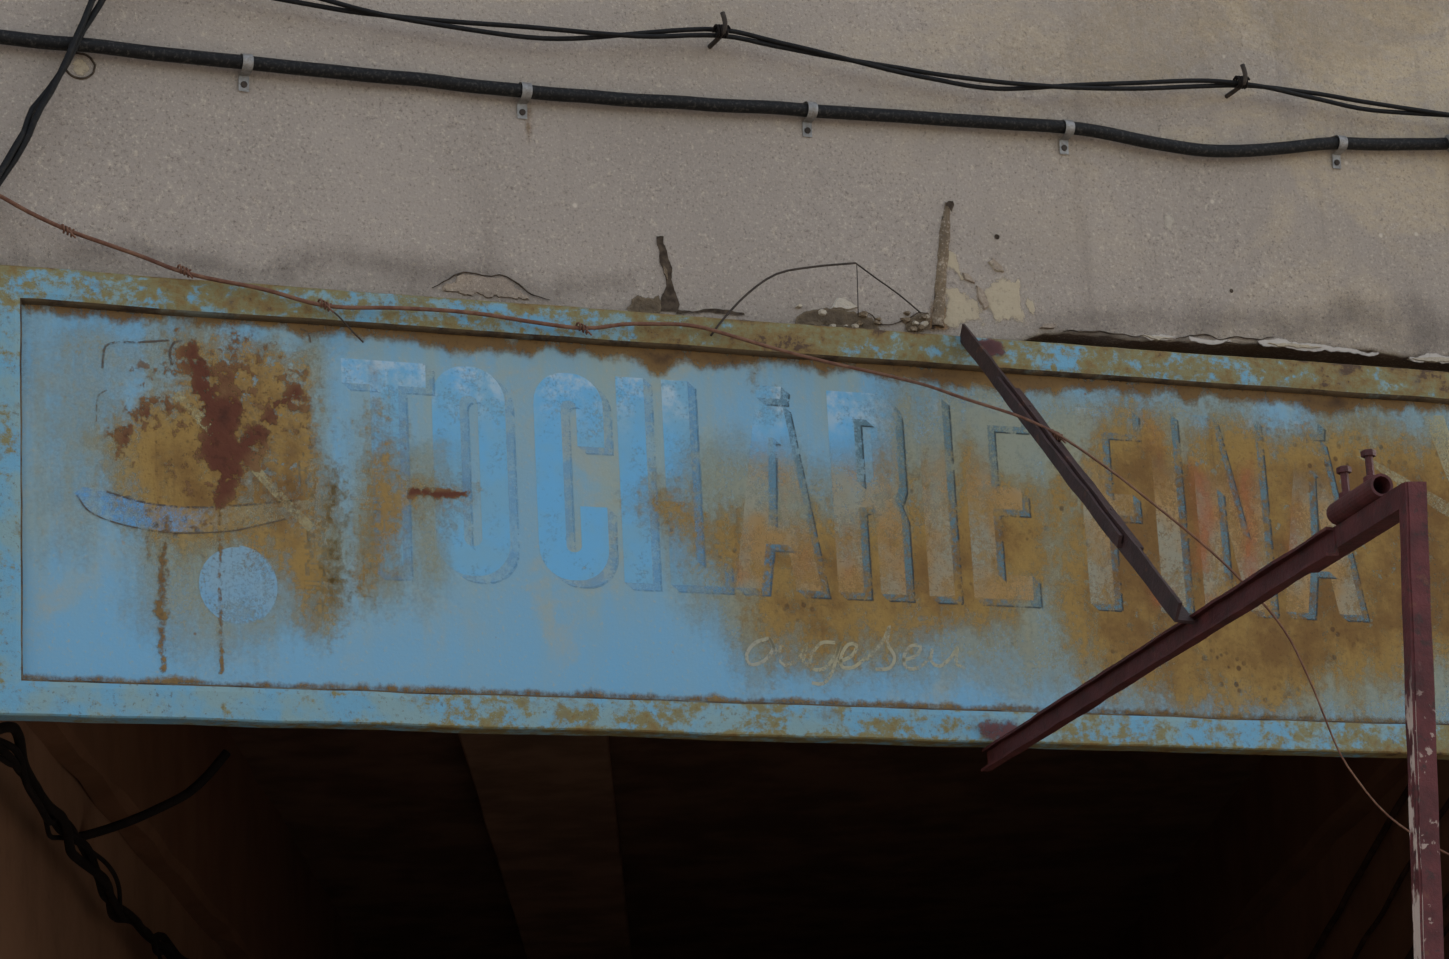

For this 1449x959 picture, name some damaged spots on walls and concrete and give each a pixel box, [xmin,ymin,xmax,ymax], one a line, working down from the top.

peeling [795,251,1056,333]
peeling [627,295,661,313]
peeling [1139,334,1230,345]
peeling [1258,338,1379,356]
peeling [1407,353,1449,363]